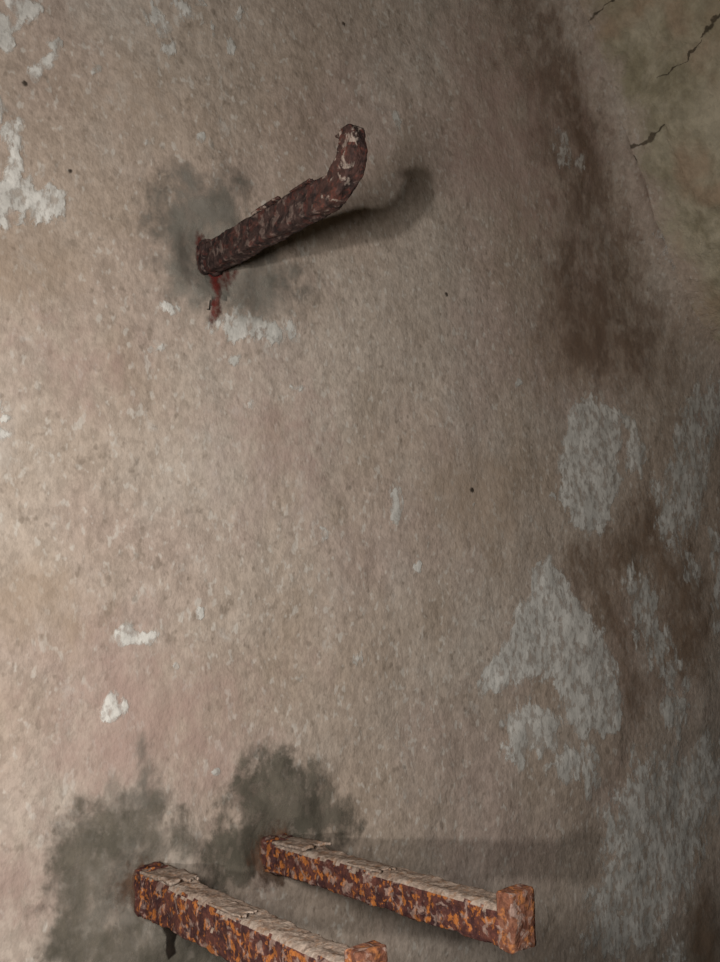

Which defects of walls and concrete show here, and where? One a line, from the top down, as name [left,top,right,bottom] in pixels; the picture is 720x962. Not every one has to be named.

peeling [0,0,44,52]
peeling [27,37,63,77]
crack [658,14,720,77]
peeling [0,99,66,229]
crack [630,124,665,161]
corrosion [251,178,314,216]
water stain [168,188,276,312]
corrosion [209,270,236,321]
water stain [202,749,364,892]
water stain [47,776,221,962]